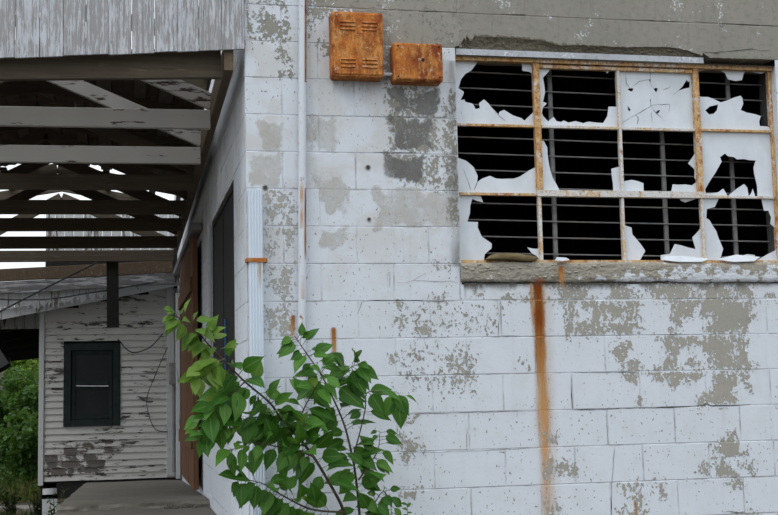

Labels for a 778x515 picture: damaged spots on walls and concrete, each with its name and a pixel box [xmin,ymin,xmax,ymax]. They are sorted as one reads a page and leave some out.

peeling [246,0,704,226]
peeling [261,186,298,342]
corrosion [530,279,548,454]
peeling [387,264,778,410]
peeling [614,474,668,515]
peeling [698,427,759,494]